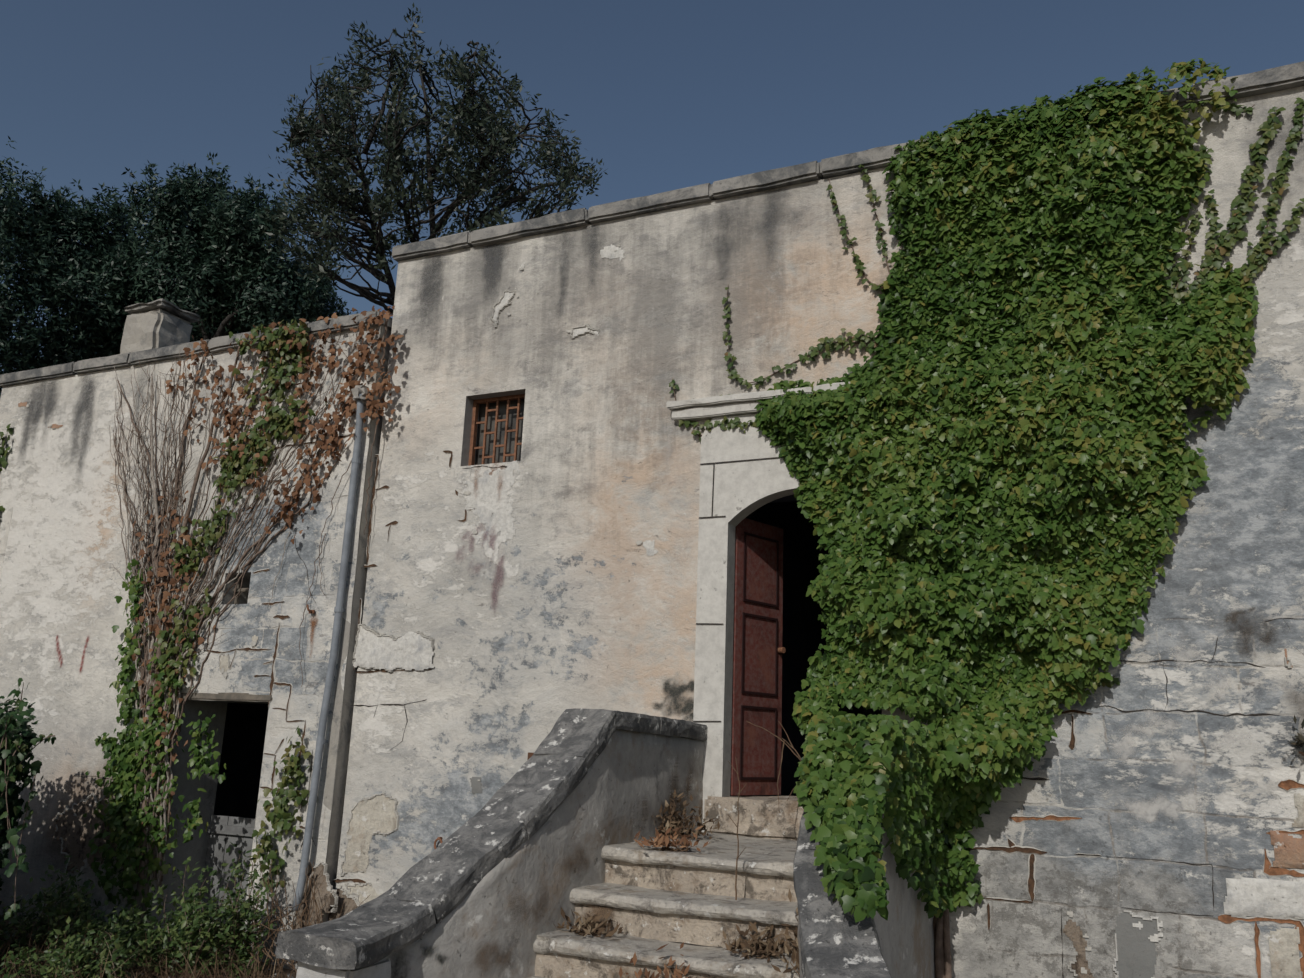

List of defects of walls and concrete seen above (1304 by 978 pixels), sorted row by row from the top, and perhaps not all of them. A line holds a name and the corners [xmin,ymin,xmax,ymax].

damp [22,390,55,449]
damp [74,385,91,465]
crack [268,433,398,568]
crack [204,533,316,850]
crack [349,669,432,752]
crack [1061,637,1275,750]
crack [964,776,1304,978]
spalling [1223,793,1304,978]
spalling [1063,911,1095,978]
spalling [1112,910,1163,978]